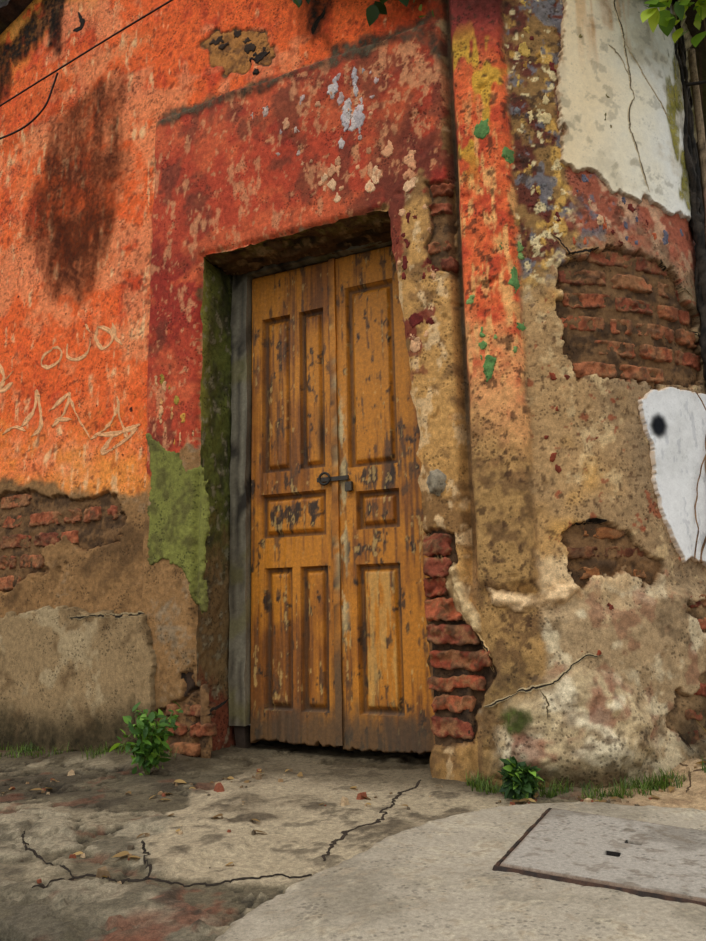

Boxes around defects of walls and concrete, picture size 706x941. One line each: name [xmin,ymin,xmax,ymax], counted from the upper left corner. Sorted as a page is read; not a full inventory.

water stain [0,0,65,99]
water stain [26,80,123,301]
peeling [315,67,394,203]
crack [609,0,671,192]
peeling [514,0,706,567]
spalling [0,492,127,592]
peeling [146,374,210,614]
spalling [561,522,660,588]
spalling [423,530,497,746]
crack [463,620,494,671]
crack [484,653,603,718]
crack [21,780,421,889]